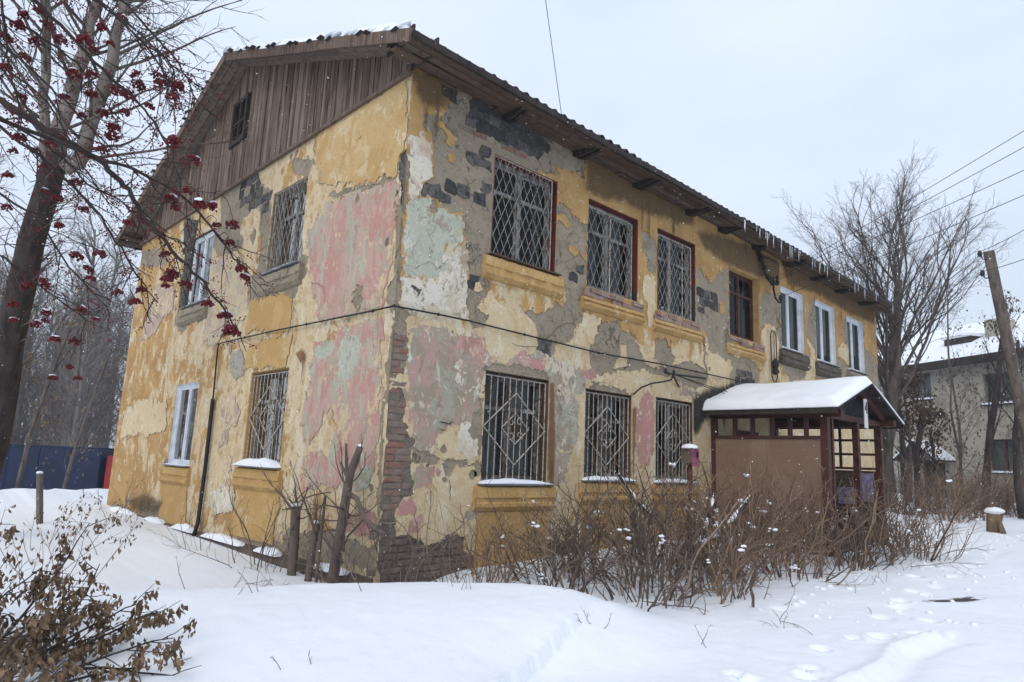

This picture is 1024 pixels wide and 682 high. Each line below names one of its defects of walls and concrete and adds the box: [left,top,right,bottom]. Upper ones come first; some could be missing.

flaking render [139,77,827,583]
peeling [117,398,172,446]
flaking render [110,502,160,517]